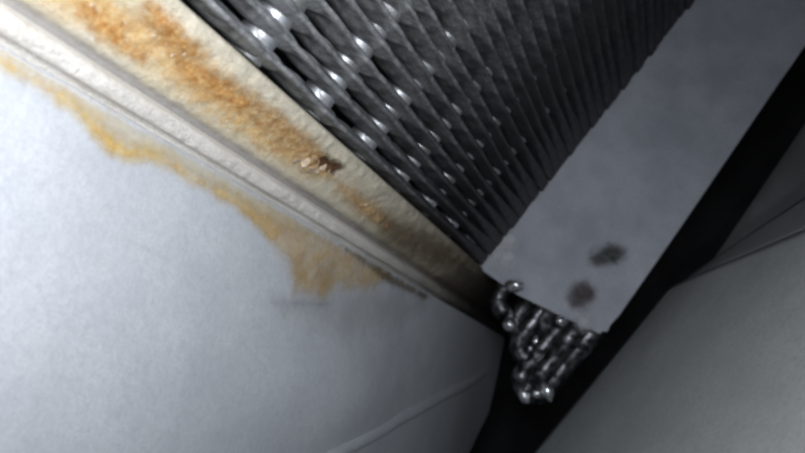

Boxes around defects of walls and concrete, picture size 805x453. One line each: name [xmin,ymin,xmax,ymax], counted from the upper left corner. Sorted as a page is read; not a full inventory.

corrosion [53,0,343,177]
damp [57,87,382,294]
corrosion [356,255,427,300]